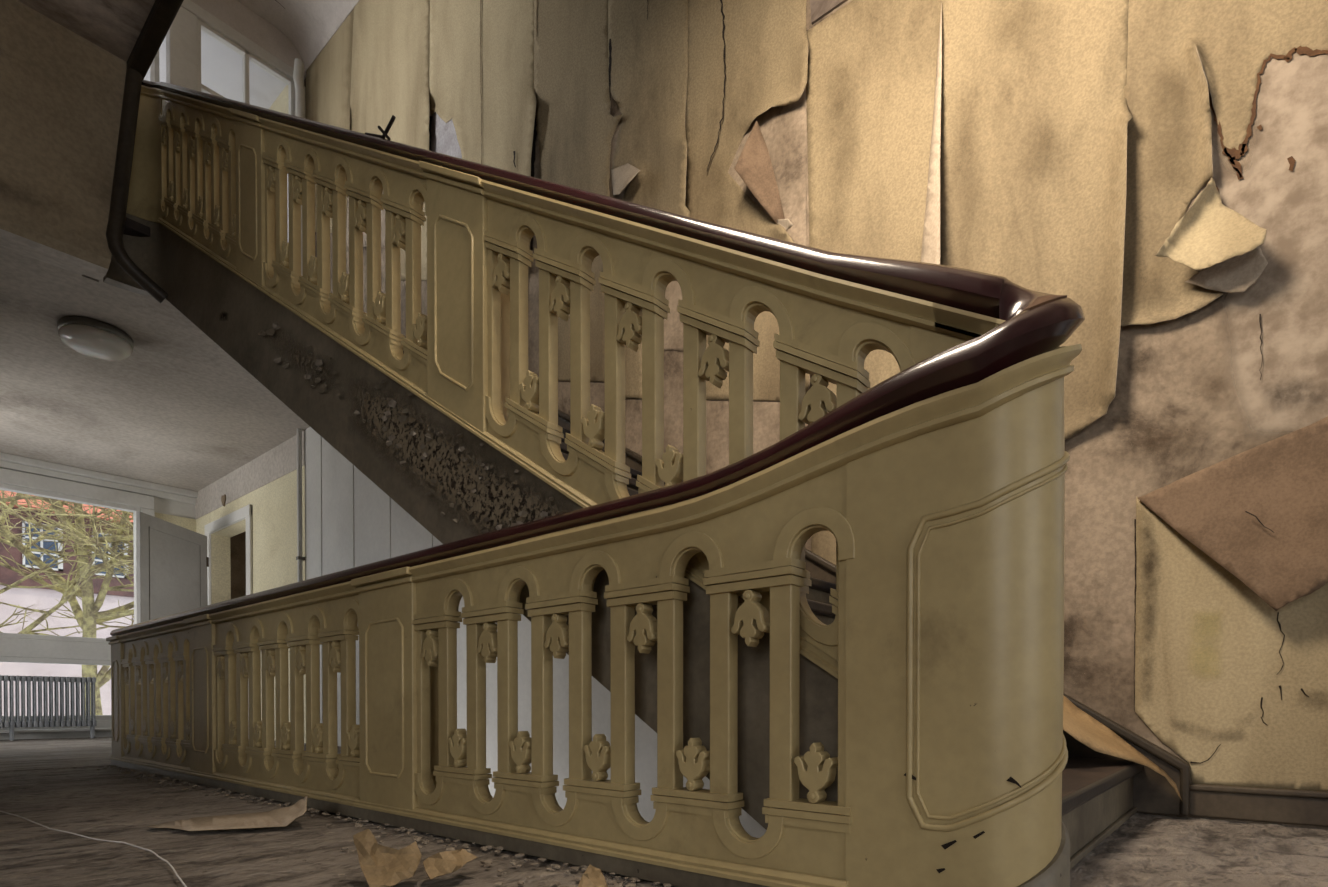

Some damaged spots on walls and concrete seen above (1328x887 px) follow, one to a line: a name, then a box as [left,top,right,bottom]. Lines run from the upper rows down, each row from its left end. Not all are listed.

flaking render [430,111,462,159]
flaking render [728,86,807,246]
flaking render [1206,46,1328,433]
flaking render [664,281,683,351]
crack [1260,612,1309,726]